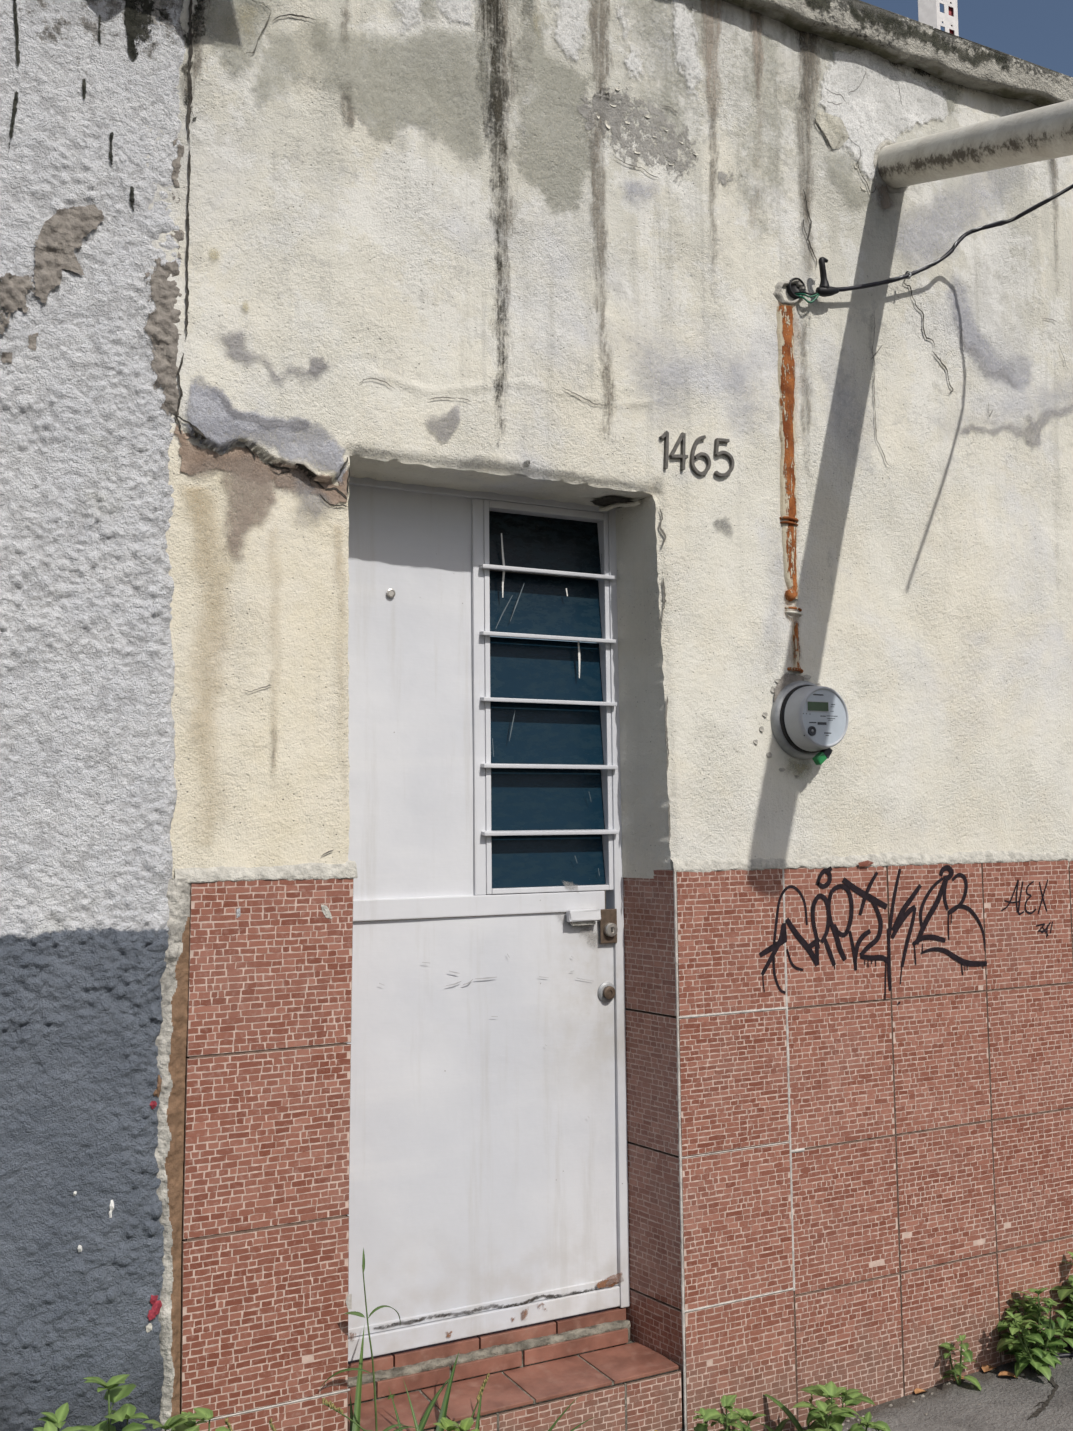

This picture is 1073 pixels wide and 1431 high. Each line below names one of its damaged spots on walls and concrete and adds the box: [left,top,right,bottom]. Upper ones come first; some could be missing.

damp [124,0,173,61]
damp [181,0,266,121]
spalling [171,137,184,203]
damp [336,0,613,420]
peeling [816,48,948,209]
spalling [0,204,104,334]
spalling [1,333,39,363]
spalling [138,229,348,505]
damp [222,333,326,380]
crack [904,280,953,393]
damp [953,294,990,365]
damp [193,457,275,556]